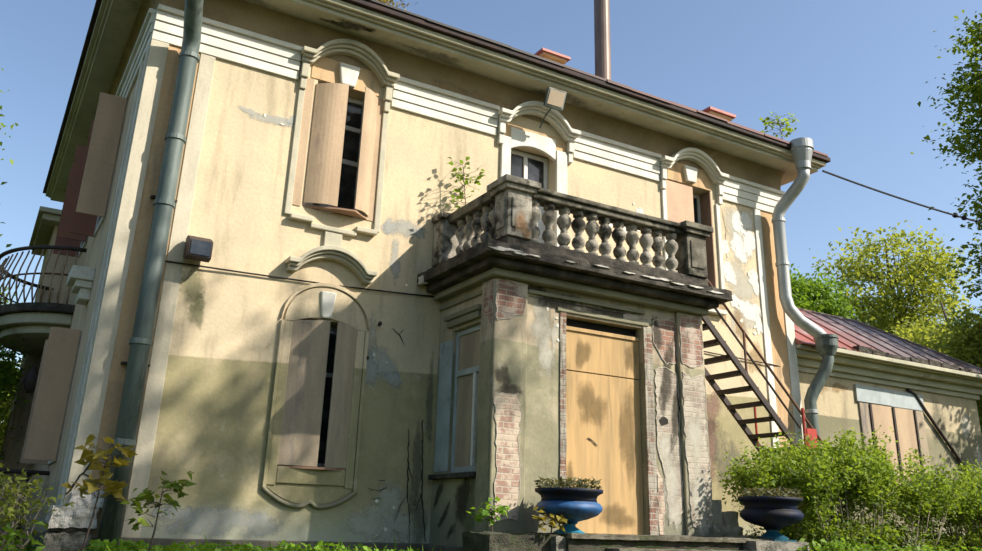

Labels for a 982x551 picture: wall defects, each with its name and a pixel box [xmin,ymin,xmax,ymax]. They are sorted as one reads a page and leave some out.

damp [191,302,204,324]
spalling [490,246,541,258]
flaking render [482,279,560,369]
peeling [623,210,763,335]
flaking render [493,392,522,522]
flaking render [623,314,759,538]